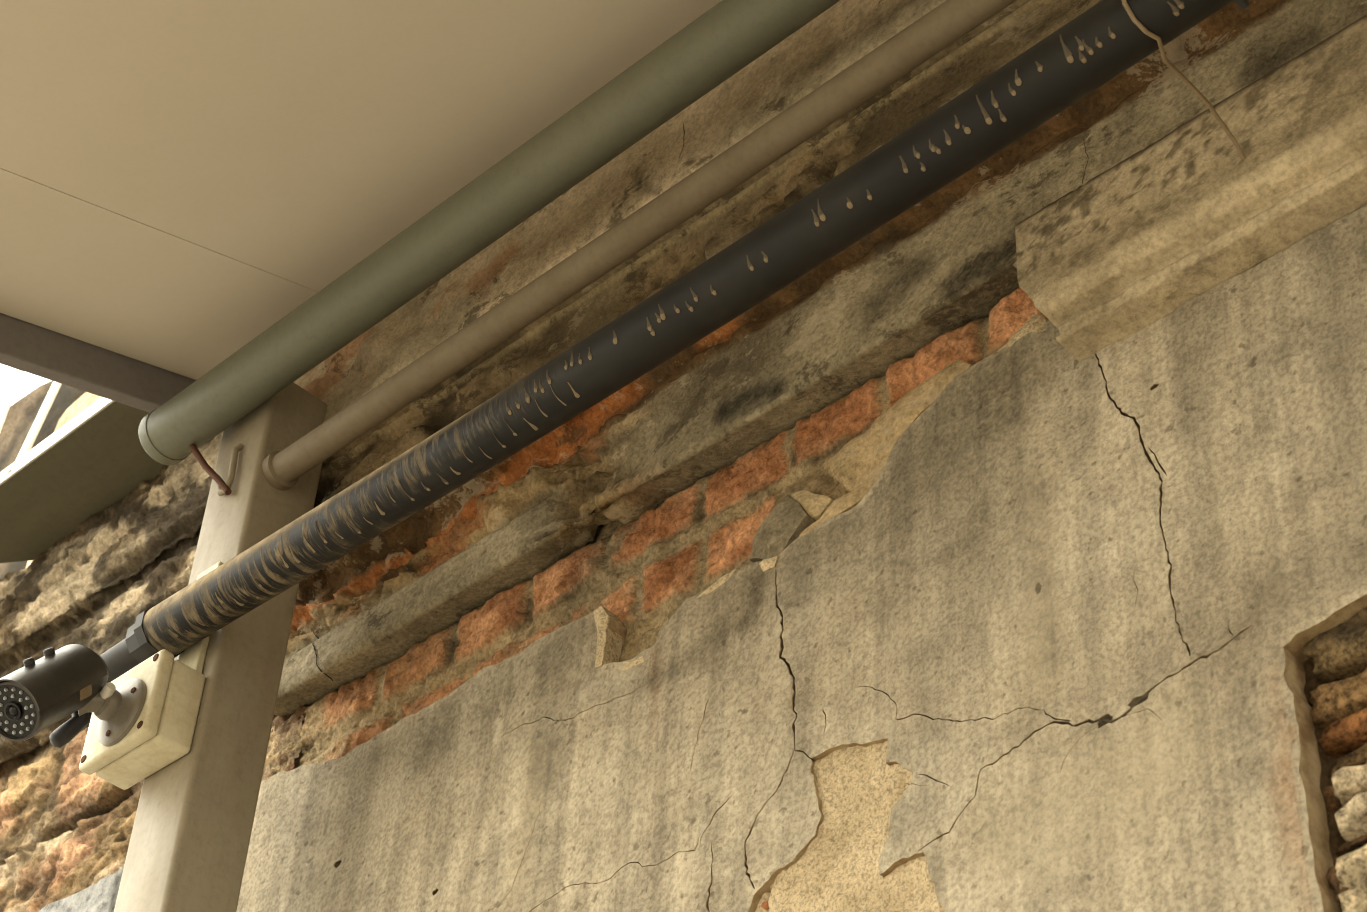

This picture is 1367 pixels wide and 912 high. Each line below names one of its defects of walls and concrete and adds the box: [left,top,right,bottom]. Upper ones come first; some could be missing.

water stain [716,383,781,419]
spalling [0,712,144,912]
spalling [0,431,223,678]
spalling [261,287,1050,781]
crack [745,825,755,889]
crack [773,572,826,796]
spalling [755,741,946,912]
crack [865,354,1247,839]
spalling [1303,607,1367,912]